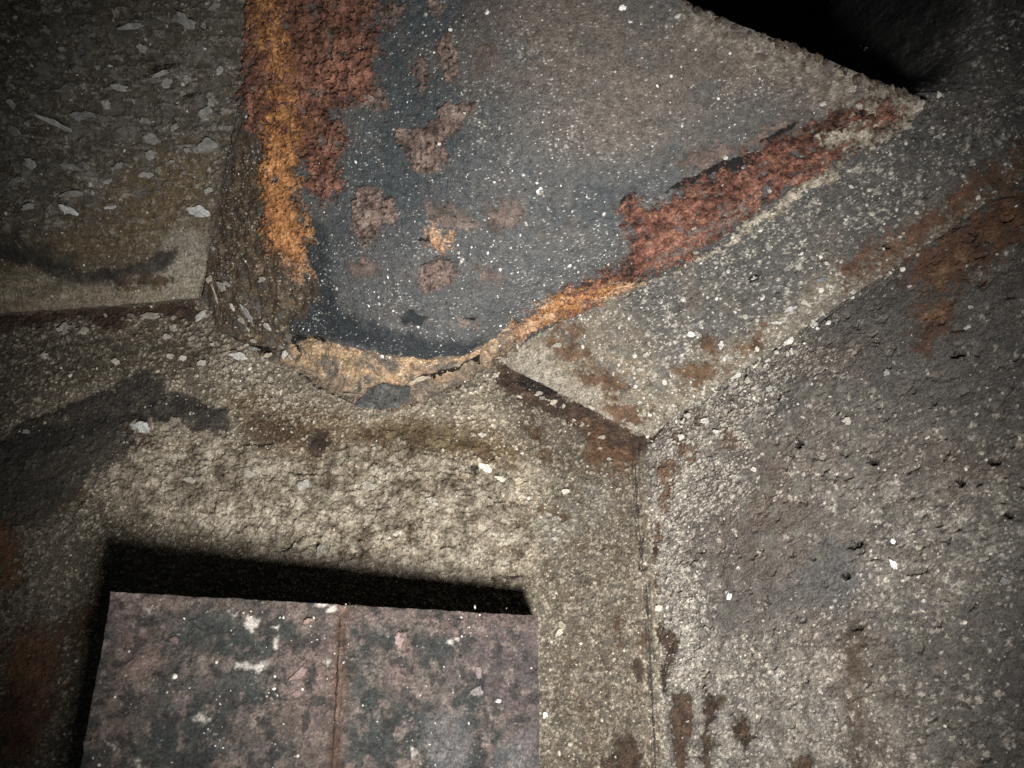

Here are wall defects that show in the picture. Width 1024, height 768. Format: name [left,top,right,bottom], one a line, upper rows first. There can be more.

corrosion [236,0,386,286]
corrosion [418,218,456,252]
corrosion [509,95,913,342]
corrosion [837,134,1024,359]
leakage [0,370,231,528]
corrosion [493,364,650,477]